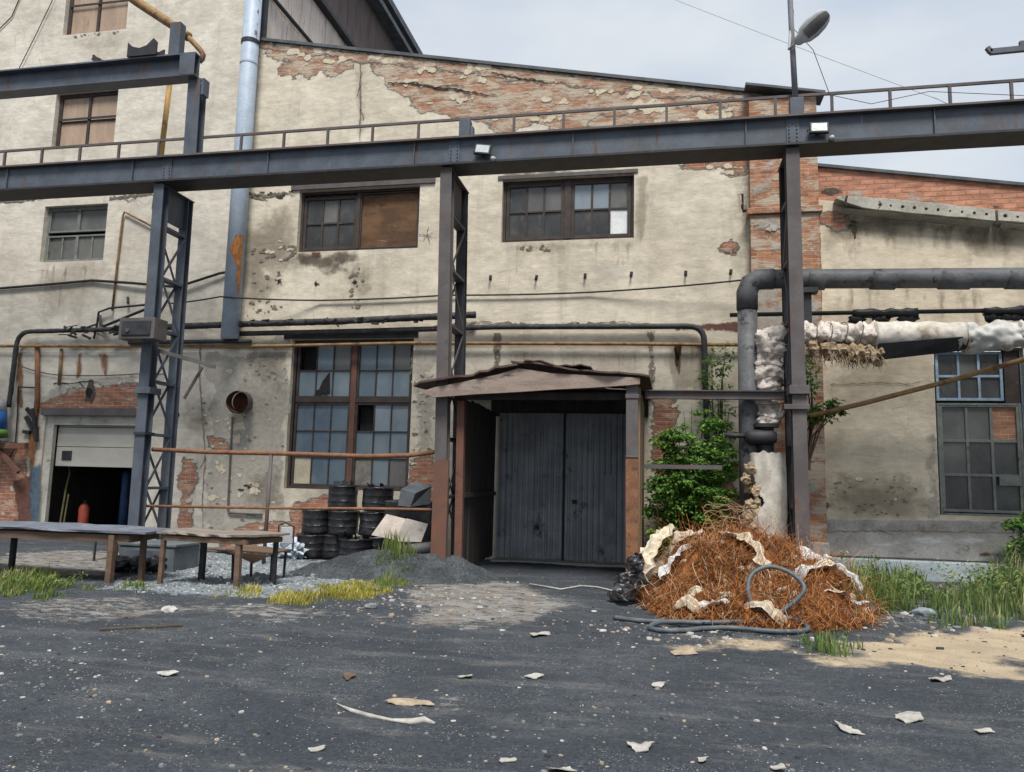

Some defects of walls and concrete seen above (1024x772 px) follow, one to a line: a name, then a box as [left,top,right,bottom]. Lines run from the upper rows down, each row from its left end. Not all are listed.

crack [356,64,364,138]
flaking render [259,41,773,133]
rust [230,235,243,293]
water stain [299,253,365,309]
flaking render [718,238,740,256]
flaking render [33,379,138,416]
flaking render [176,335,329,538]
flaking render [647,331,680,528]
flaking render [0,441,28,521]